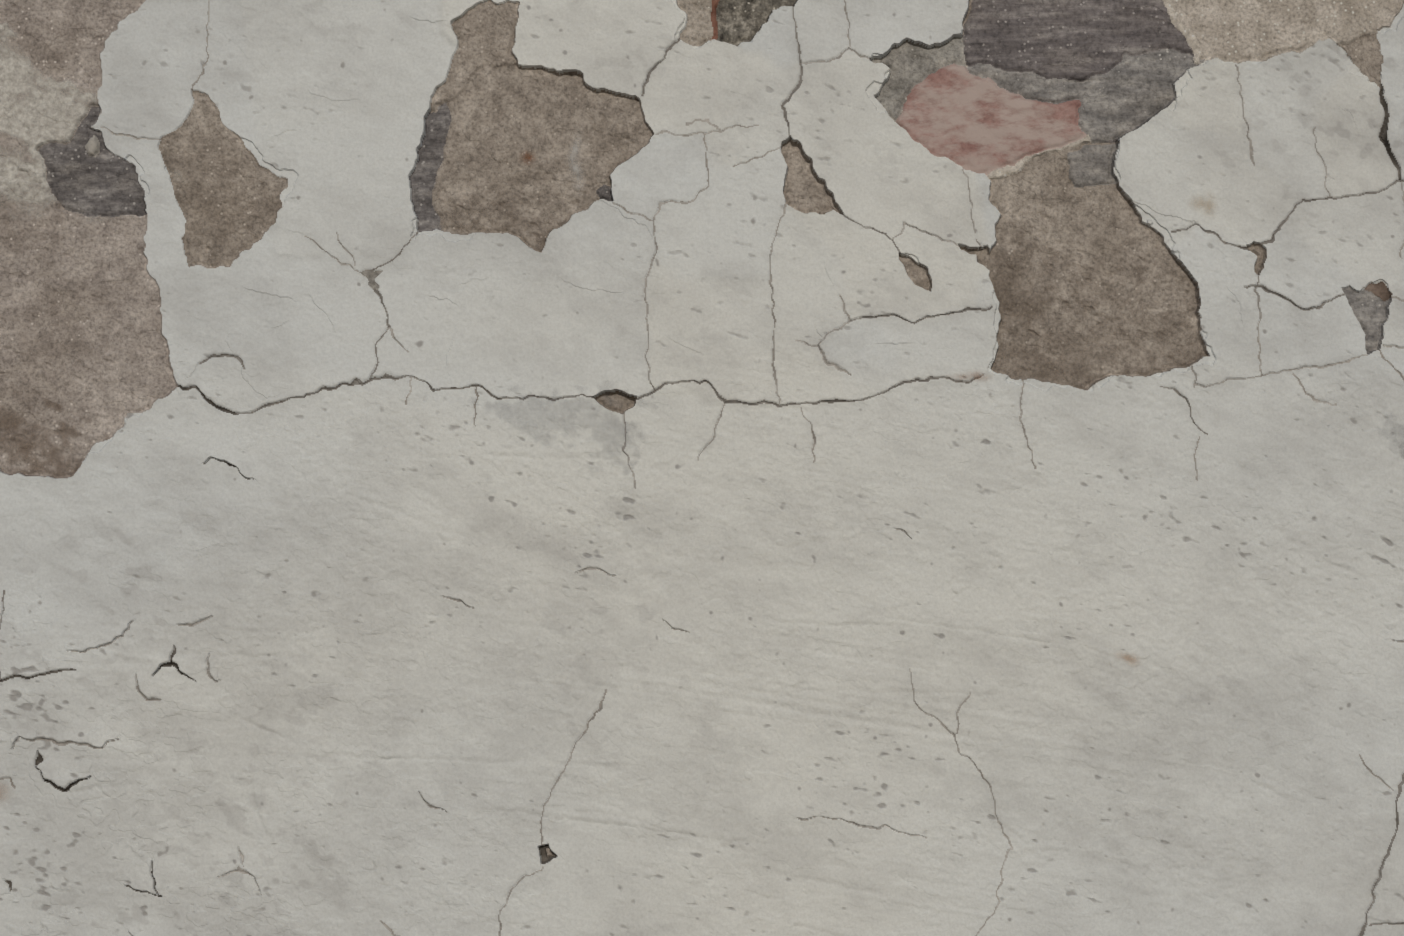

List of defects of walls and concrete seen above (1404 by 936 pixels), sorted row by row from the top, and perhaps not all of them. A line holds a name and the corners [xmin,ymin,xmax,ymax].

flaking render [0,0,178,479]
crack [191,0,209,90]
peeling [201,450,255,480]
crack [178,231,595,426]
peeling [159,0,1404,414]
crack [612,0,993,489]
crack [1019,380,1037,469]
crack [1235,64,1255,166]
crack [1160,84,1404,481]
crack [0,668,76,682]
crack [498,689,607,936]
crack [1359,754,1404,936]